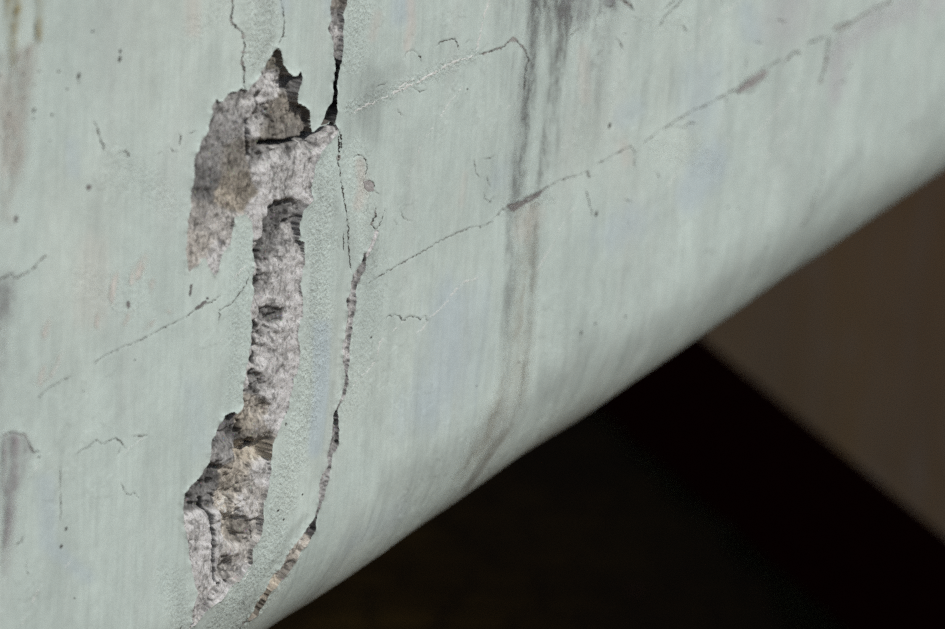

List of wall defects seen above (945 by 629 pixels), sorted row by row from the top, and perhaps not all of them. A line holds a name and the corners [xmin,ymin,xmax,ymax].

crack [229,0,246,87]
spalling [183,48,339,629]
crack [240,0,891,629]